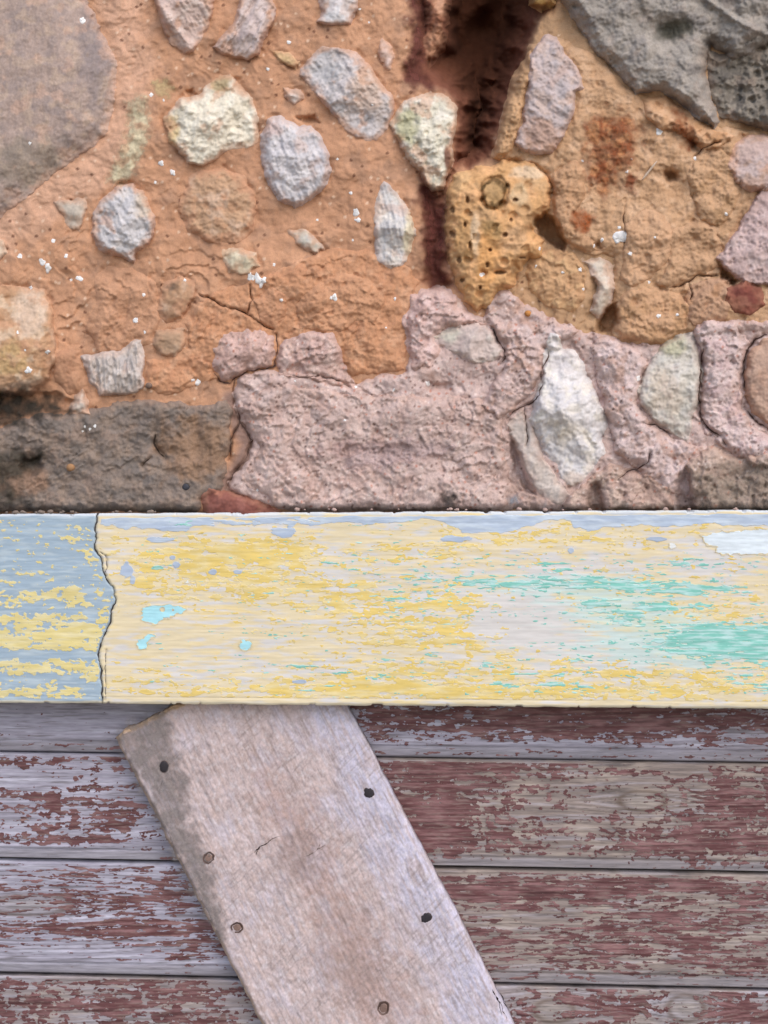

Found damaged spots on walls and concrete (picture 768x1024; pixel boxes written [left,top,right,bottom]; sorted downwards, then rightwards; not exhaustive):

water stain [404,0,432,89]
water stain [420,184,449,287]
water stain [481,179,507,208]
crack [512,354,549,442]
peeling [0,514,768,1024]